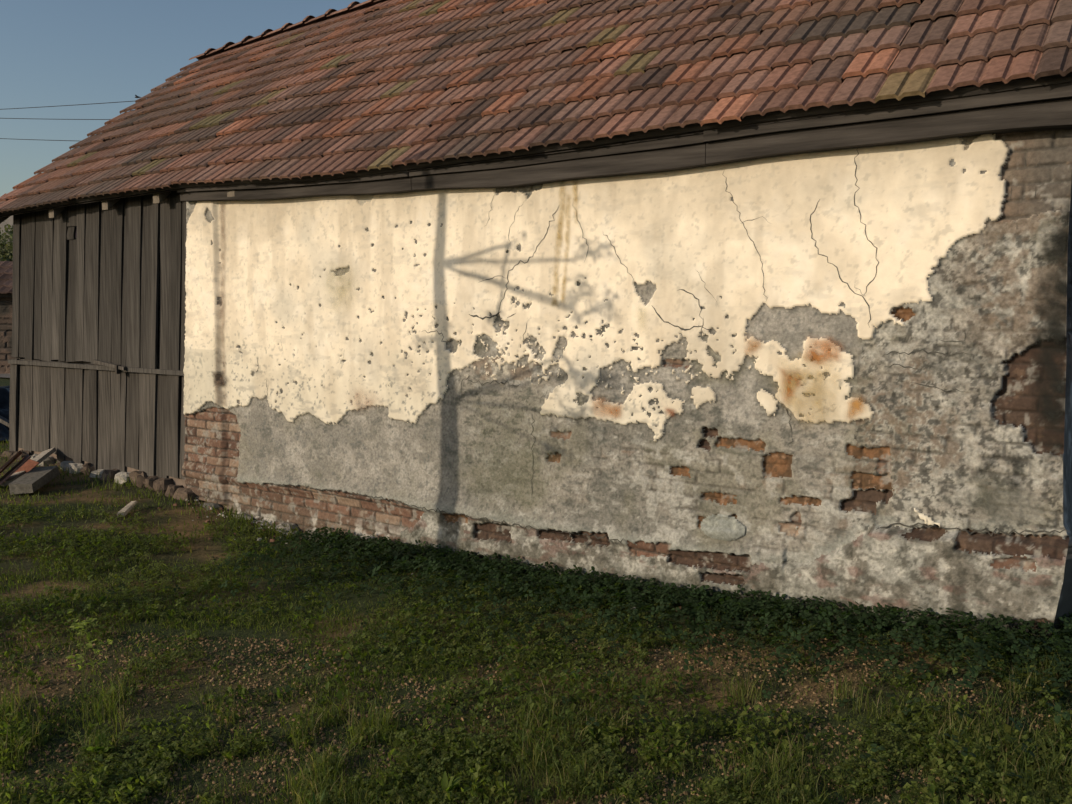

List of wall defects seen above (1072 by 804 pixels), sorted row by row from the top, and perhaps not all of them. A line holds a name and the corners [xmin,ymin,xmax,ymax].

crack [722,172,769,295]
crack [469,193,636,340]
crack [652,271,715,334]
peeling [182,129,1072,635]
rust [786,375,797,395]
rust [809,342,837,363]
rust [849,400,862,414]